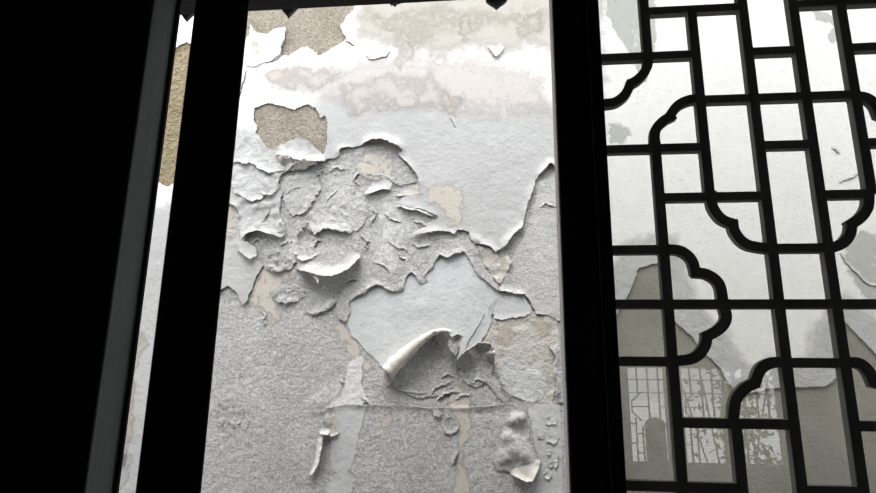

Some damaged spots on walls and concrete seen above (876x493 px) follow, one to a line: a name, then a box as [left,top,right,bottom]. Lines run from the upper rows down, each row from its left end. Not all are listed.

spalling [243,6,354,67]
leakage [265,0,551,114]
spalling [159,42,190,186]
peeling [201,94,566,493]
peeling [614,256,660,299]
peeling [670,256,693,299]
leakage [846,231,876,299]
peeling [119,205,171,493]
peeling [843,310,876,371]